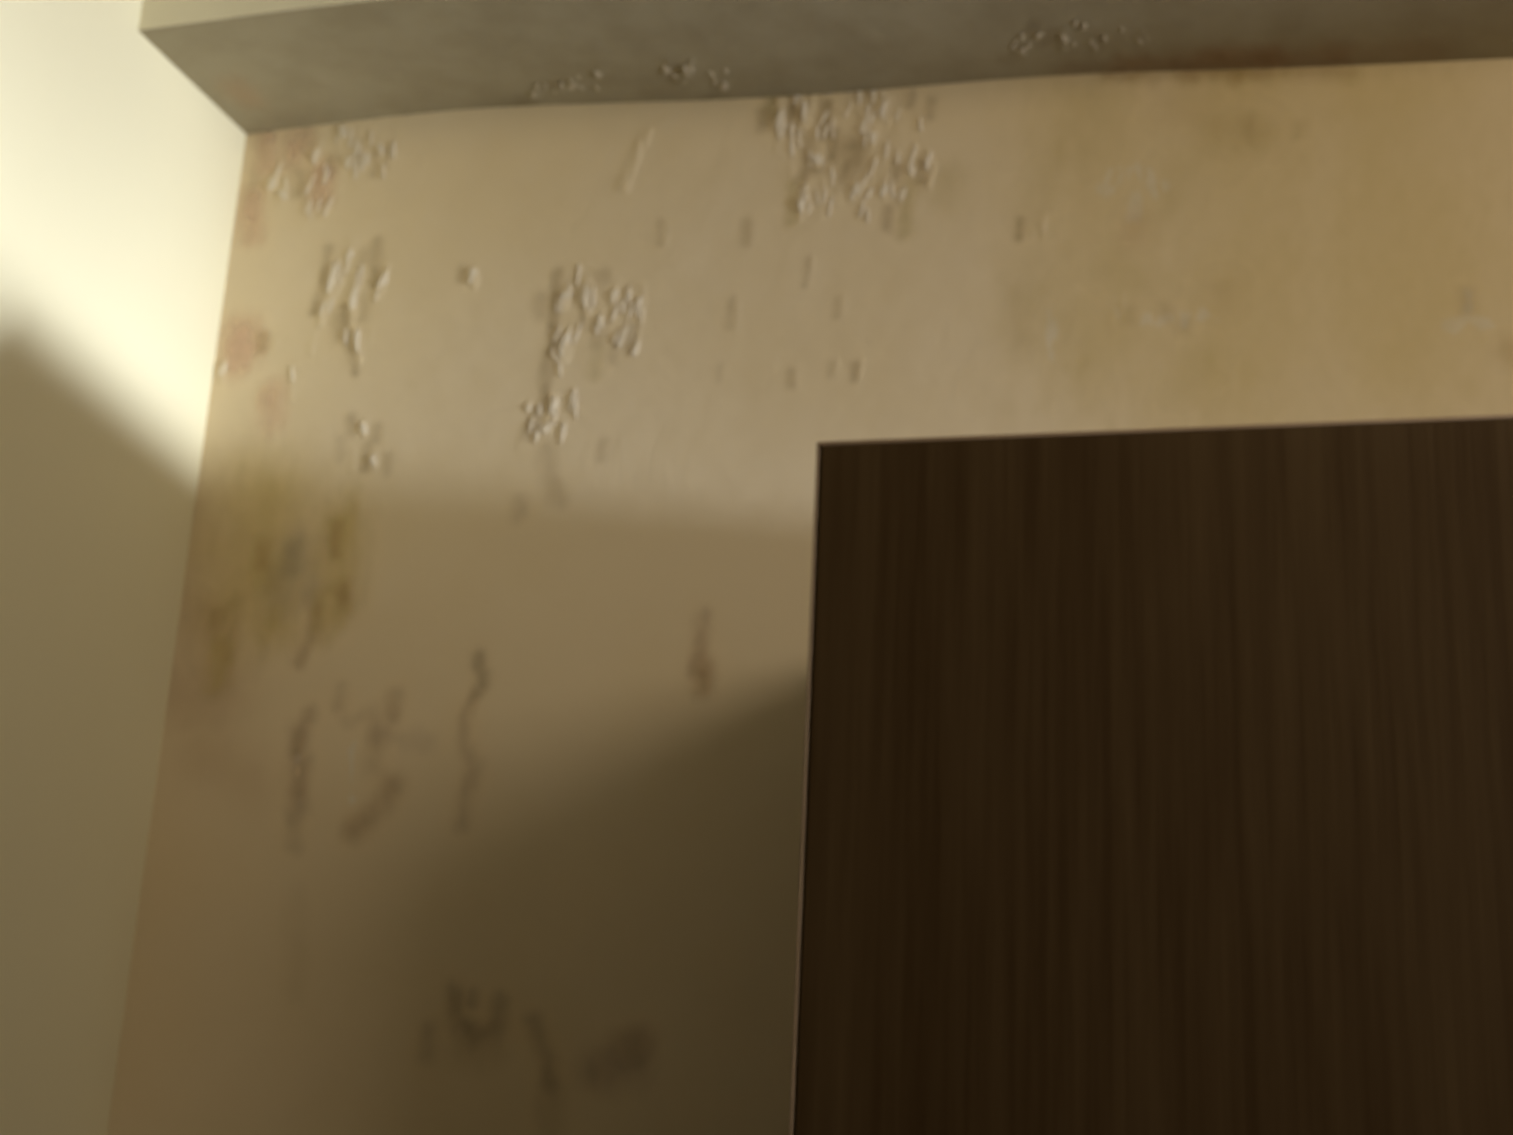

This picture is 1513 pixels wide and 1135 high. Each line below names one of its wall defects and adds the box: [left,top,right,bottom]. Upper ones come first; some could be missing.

peeling [770,89,938,242]
peeling [291,231,394,383]
peeling [515,259,649,451]
peeling [347,412,389,476]